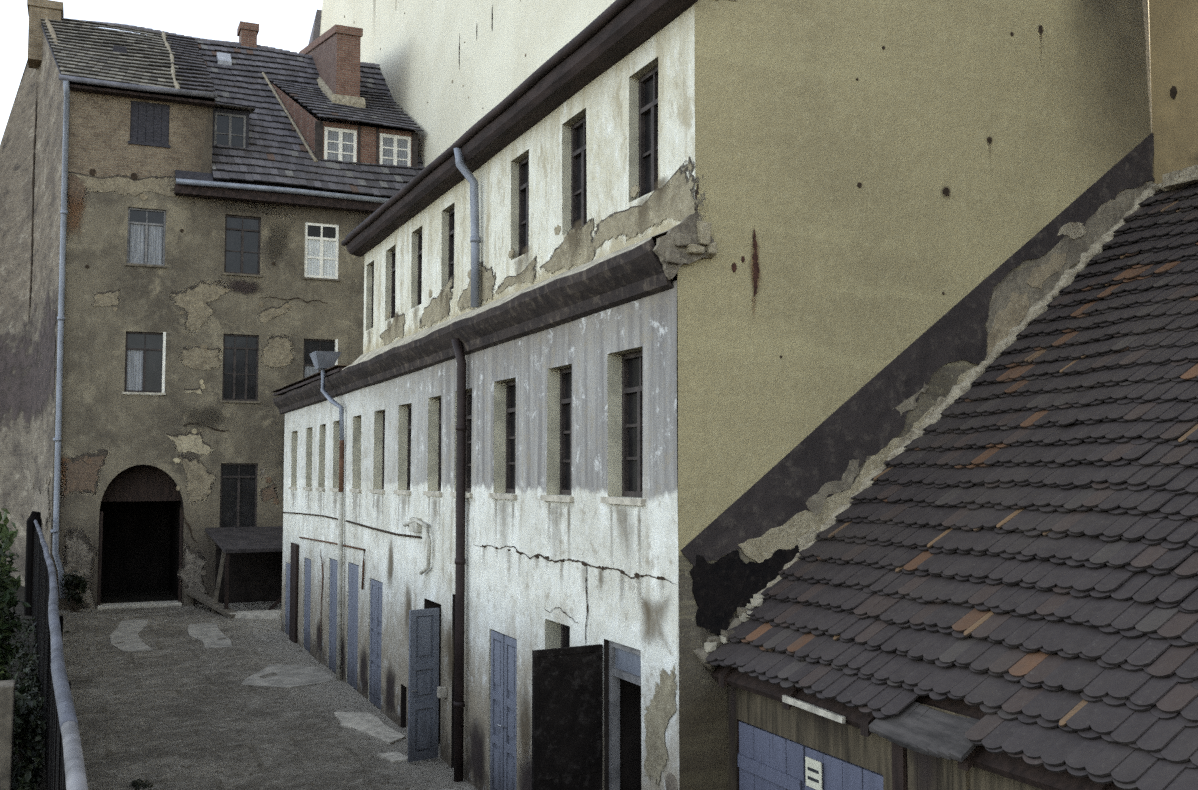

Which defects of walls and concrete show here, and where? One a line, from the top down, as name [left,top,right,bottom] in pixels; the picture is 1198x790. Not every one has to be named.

flaking render [61,171,176,208]
damp [0,283,56,429]
flaking render [170,280,229,394]
flaking render [258,301,294,368]
peeling [380,156,717,346]
spalling [956,181,1153,385]
flaking render [30,449,107,529]
flaking render [166,428,217,505]
spalling [738,381,945,563]
crack [480,545,673,645]
peeling [644,665,678,790]